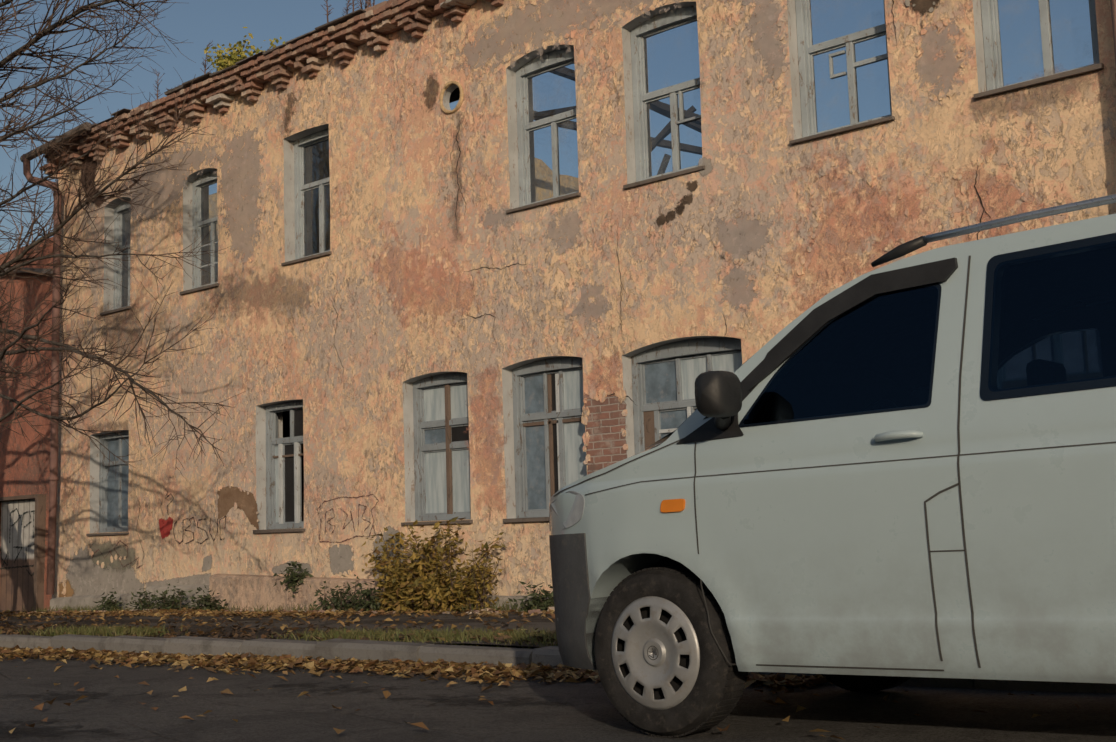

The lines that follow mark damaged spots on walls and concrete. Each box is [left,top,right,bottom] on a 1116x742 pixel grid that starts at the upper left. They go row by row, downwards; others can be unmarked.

peeling [455,0,683,82]
peeling [704,0,790,99]
peeling [904,0,973,106]
crack [450,114,466,231]
spalling [656,157,713,227]
crack [974,160,991,240]
spalling [581,389,628,474]
spalling [215,482,259,530]
spalling [61,543,212,597]